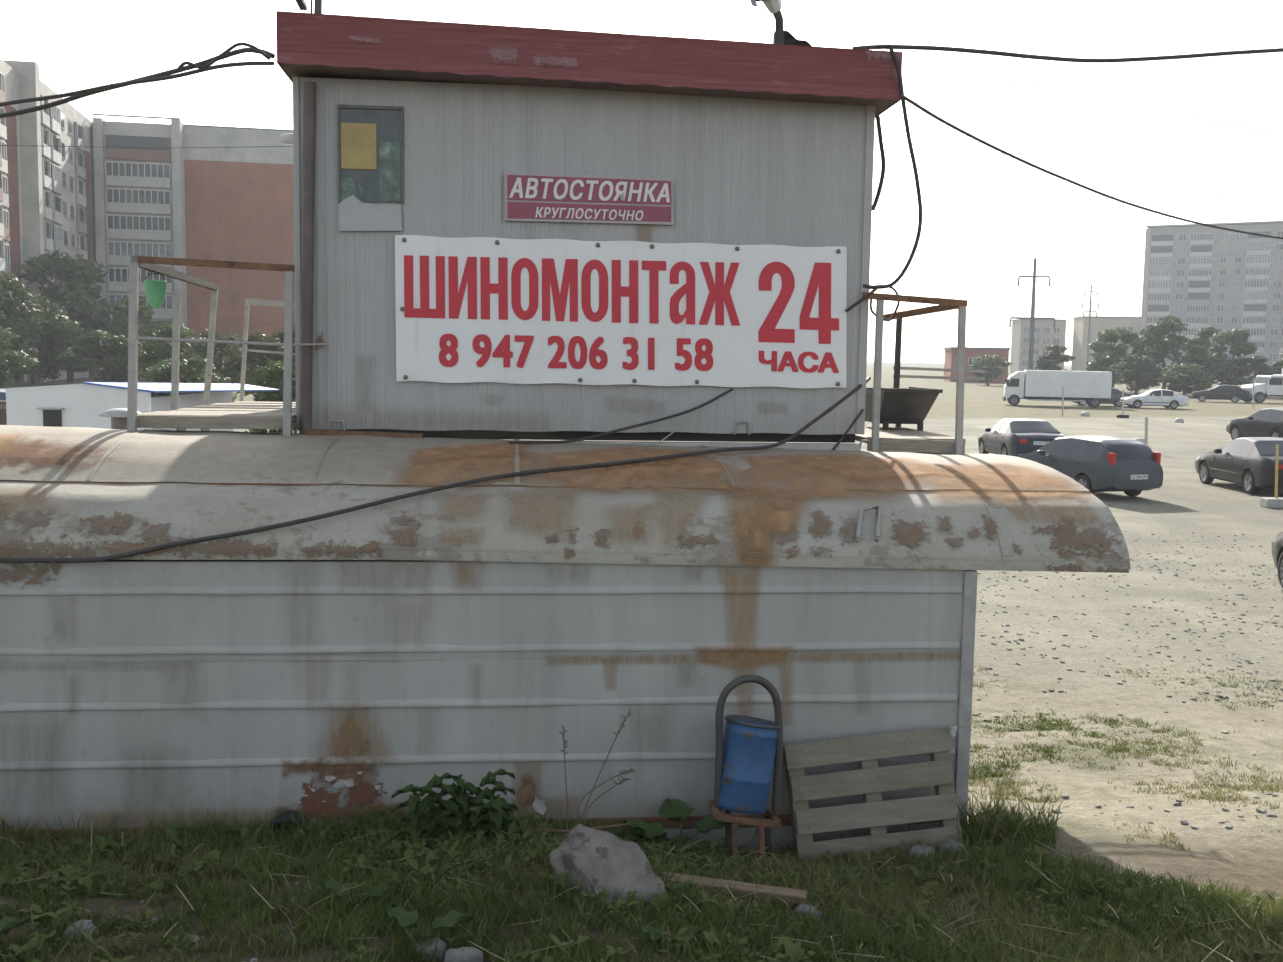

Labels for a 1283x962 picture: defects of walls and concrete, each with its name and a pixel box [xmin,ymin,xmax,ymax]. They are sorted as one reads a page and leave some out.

rust [0,435,104,471]
peeling [0,495,284,590]
peeling [300,512,421,560]
peeling [545,527,611,560]
peeling [674,529,719,551]
peeling [738,506,863,561]
peeling [889,513,999,550]
peeling [1013,514,1129,573]
rust [404,442,1083,716]
peeling [277,761,404,820]